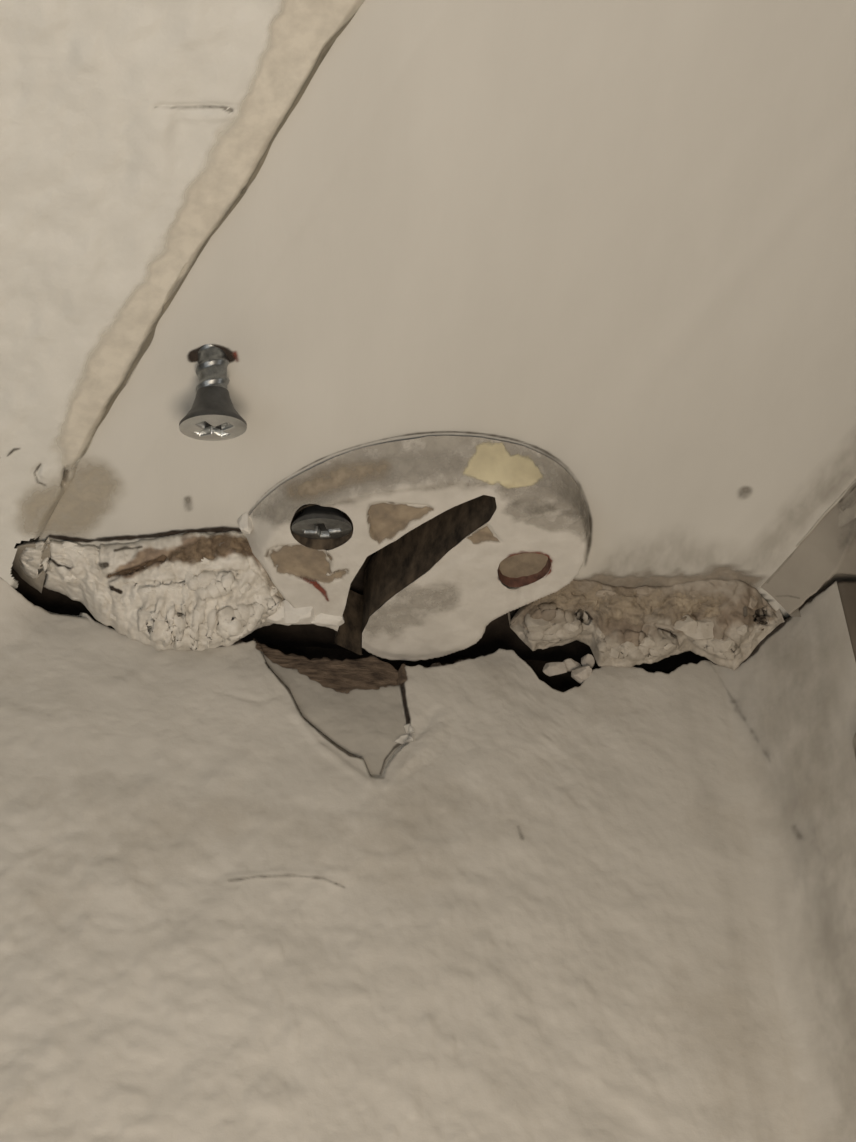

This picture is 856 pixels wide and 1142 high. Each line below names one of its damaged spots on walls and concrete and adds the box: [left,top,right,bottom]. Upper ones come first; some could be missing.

spalling [12,531,414,775]
spalling [508,566,785,670]